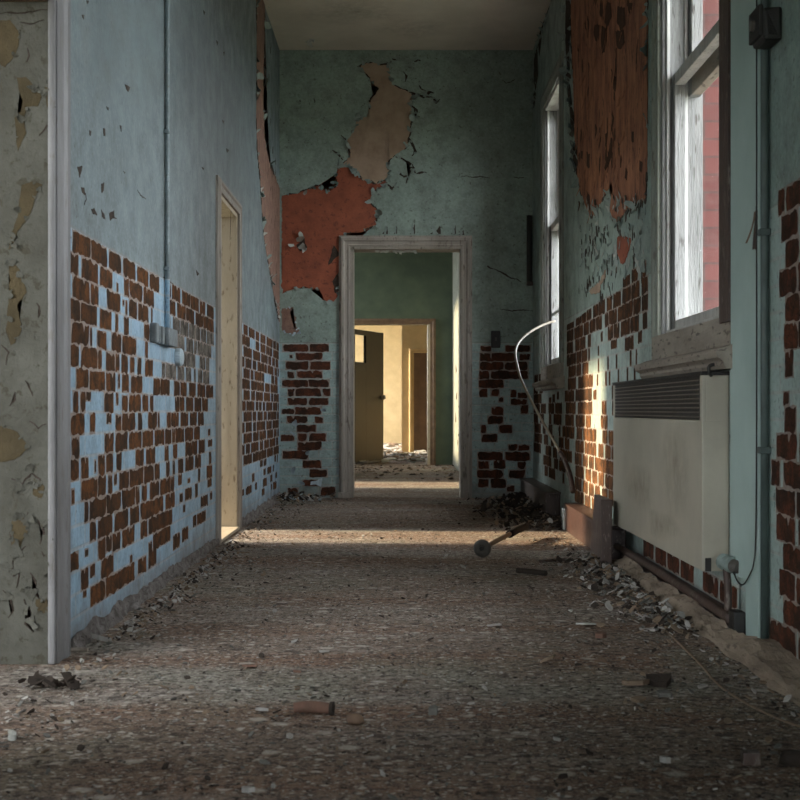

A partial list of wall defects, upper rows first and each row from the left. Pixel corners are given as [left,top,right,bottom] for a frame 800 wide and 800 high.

peeling [0,20,21,67]
peeling [14,77,49,150]
peeling [3,181,43,345]
peeling [242,0,440,496]
peeling [476,0,649,509]
peeling [778,177,800,379]
peeling [0,425,31,462]
peeling [35,598,48,617]
peeling [71,229,214,608]
peeling [769,391,800,660]